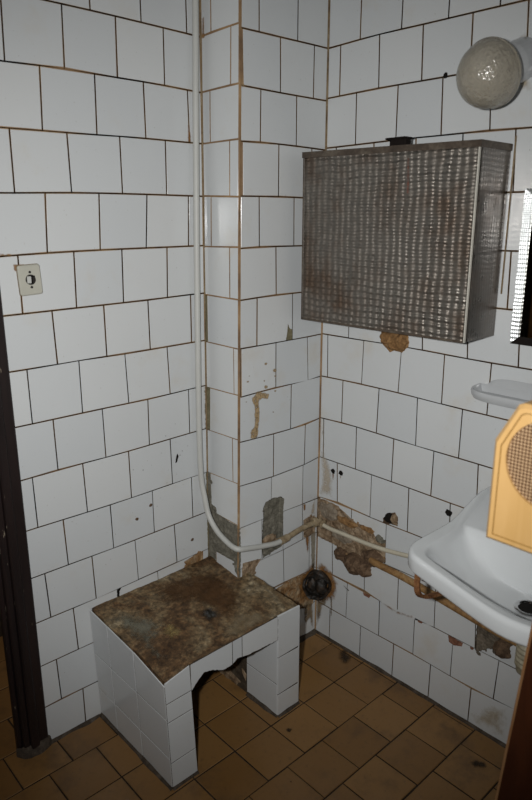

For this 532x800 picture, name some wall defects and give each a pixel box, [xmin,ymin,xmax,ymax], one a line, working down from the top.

peeling [206,472,284,578]
spalling [303,497,386,577]
hole [383,512,398,526]
spalling [448,625,513,659]